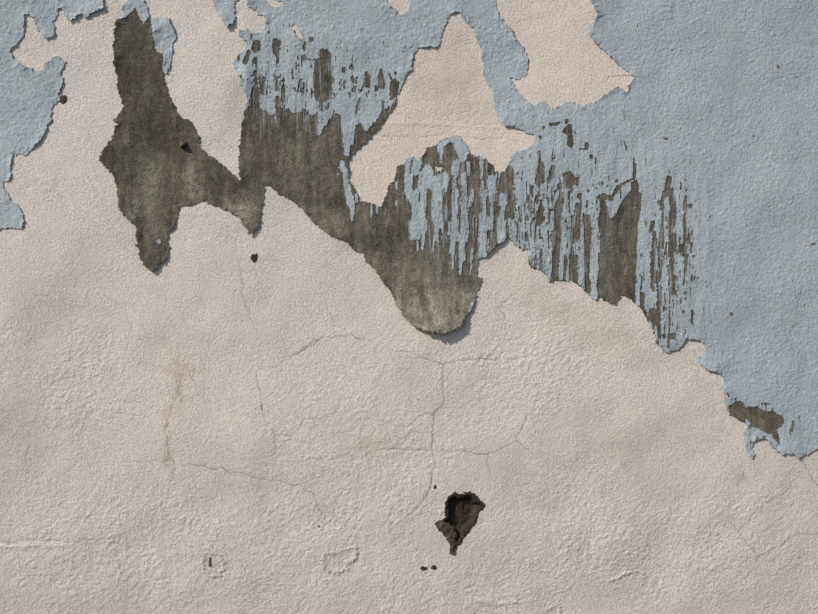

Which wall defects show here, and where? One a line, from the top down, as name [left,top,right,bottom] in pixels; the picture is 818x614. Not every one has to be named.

peeling [0,0,103,229]
peeling [99,0,818,460]
spalling [435,491,485,555]